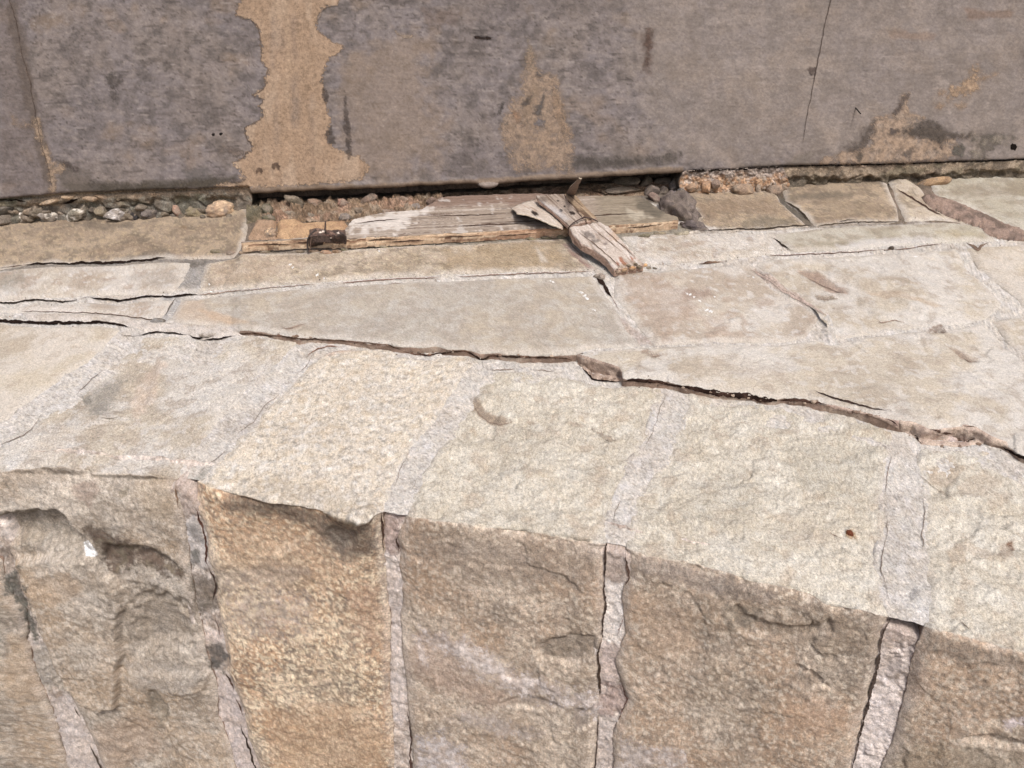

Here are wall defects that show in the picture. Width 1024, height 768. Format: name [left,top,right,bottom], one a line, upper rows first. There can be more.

peeling [216,0,370,189]
crack [803,0,831,140]
crack [2,257,164,268]
crack [0,284,309,336]
crack [240,324,572,375]
crack [624,378,887,448]
crack [1003,447,1024,459]